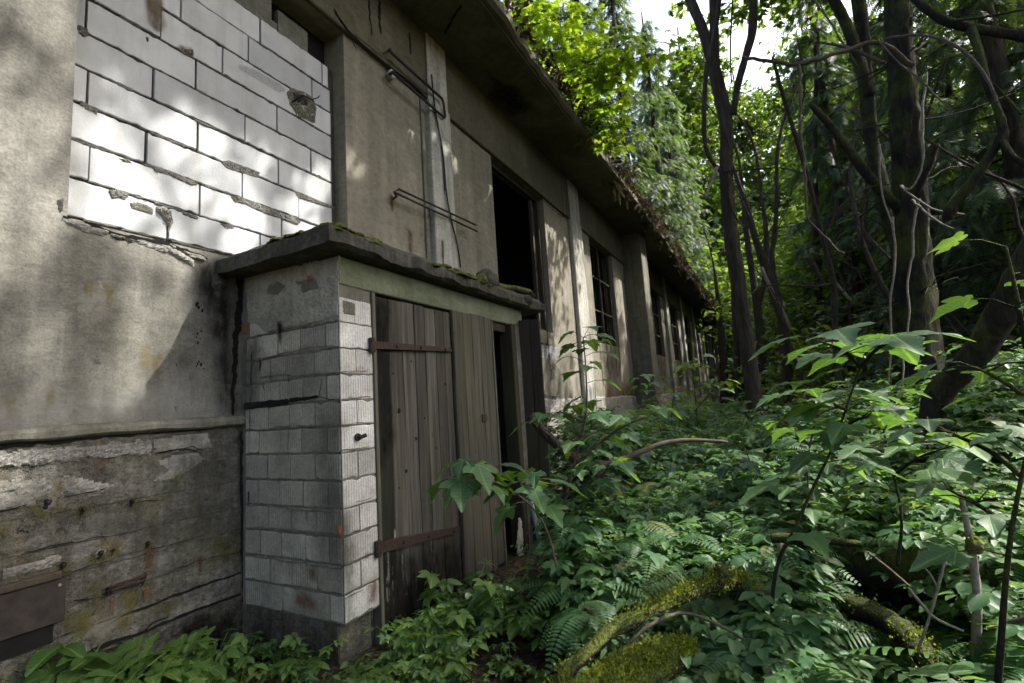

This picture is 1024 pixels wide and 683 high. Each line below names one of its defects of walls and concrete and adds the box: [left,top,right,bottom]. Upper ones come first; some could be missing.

spalling [287,88,320,123]
spalling [57,199,206,267]
flaking render [0,433,212,510]
crack [0,278,371,652]